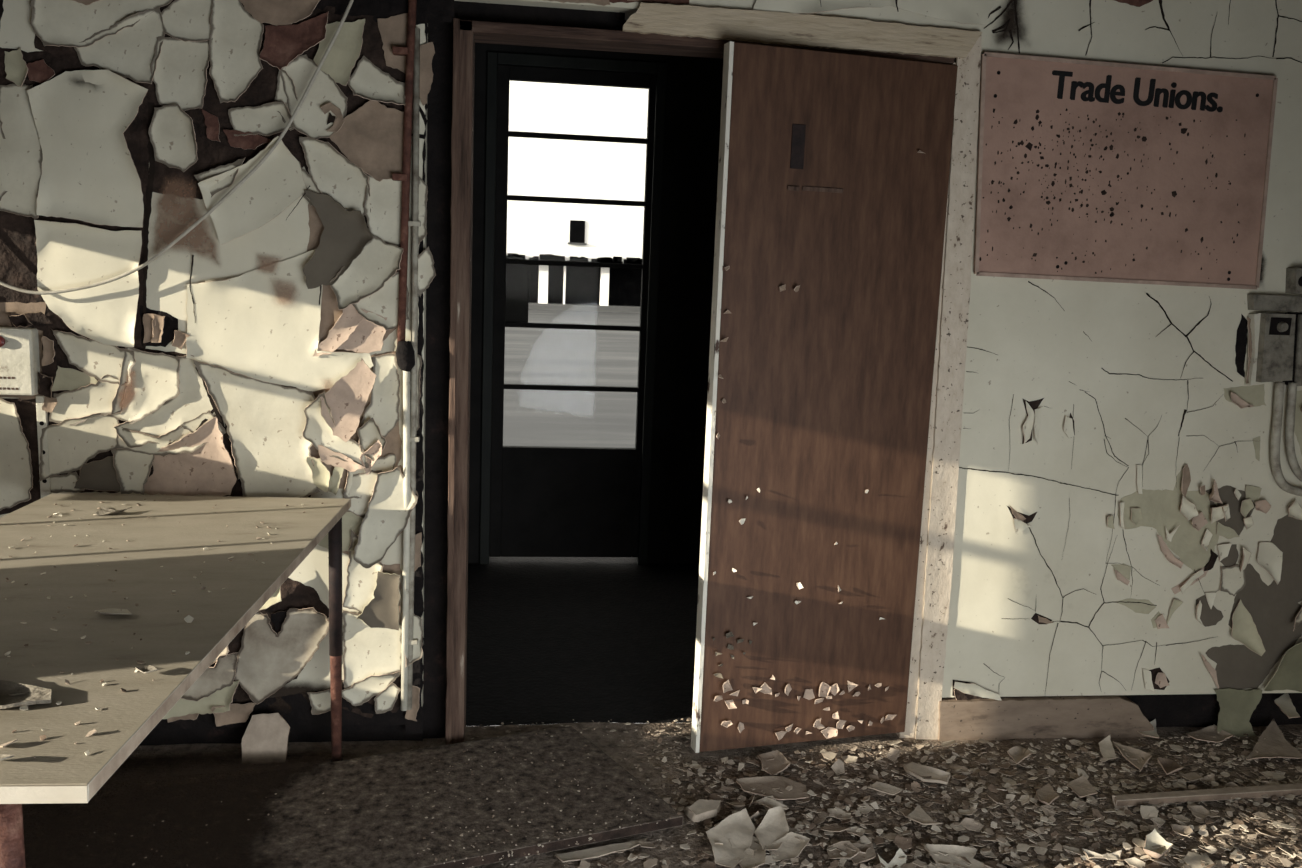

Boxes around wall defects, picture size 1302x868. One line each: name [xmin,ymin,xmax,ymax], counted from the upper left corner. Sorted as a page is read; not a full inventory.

crack [1078,0,1094,56]
crack [1146,0,1302,64]
peeling [0,0,455,734]
peeling [1022,398,1044,444]
crack [959,281,1238,691]
peeling [1007,506,1038,534]
peeling [1107,464,1302,760]